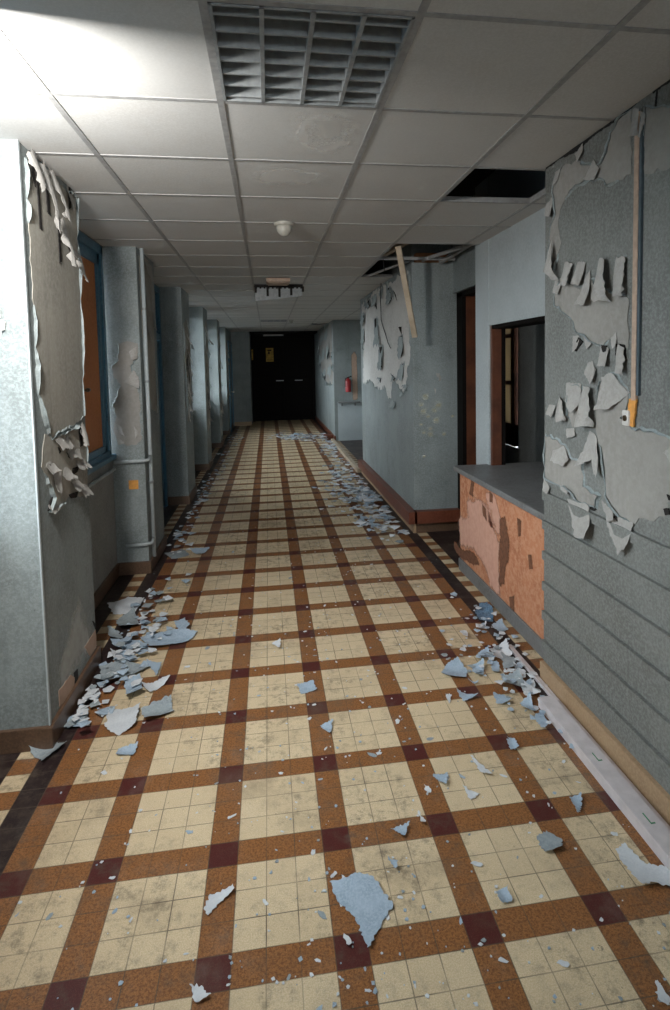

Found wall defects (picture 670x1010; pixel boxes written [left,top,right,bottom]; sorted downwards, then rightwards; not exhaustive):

peeling [24,149,94,514]
peeling [351,270,411,409]
peeling [542,104,670,555]
peeling [454,481,521,611]
peeling [475,602,508,631]